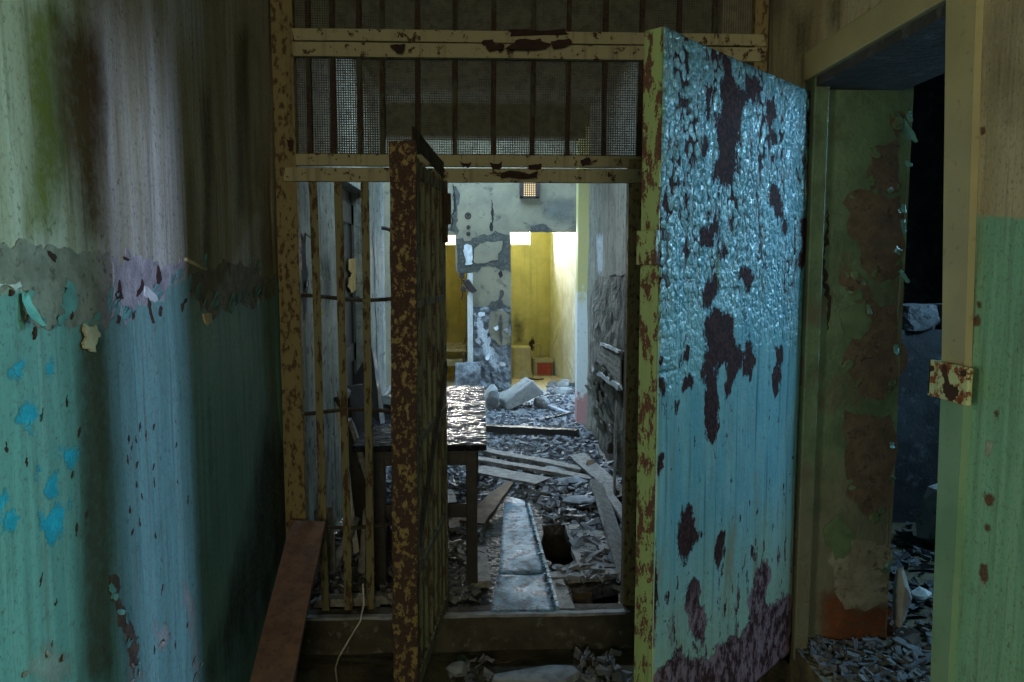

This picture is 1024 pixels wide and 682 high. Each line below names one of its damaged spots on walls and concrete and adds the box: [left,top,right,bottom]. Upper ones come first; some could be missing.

peeling [0,238,279,353]